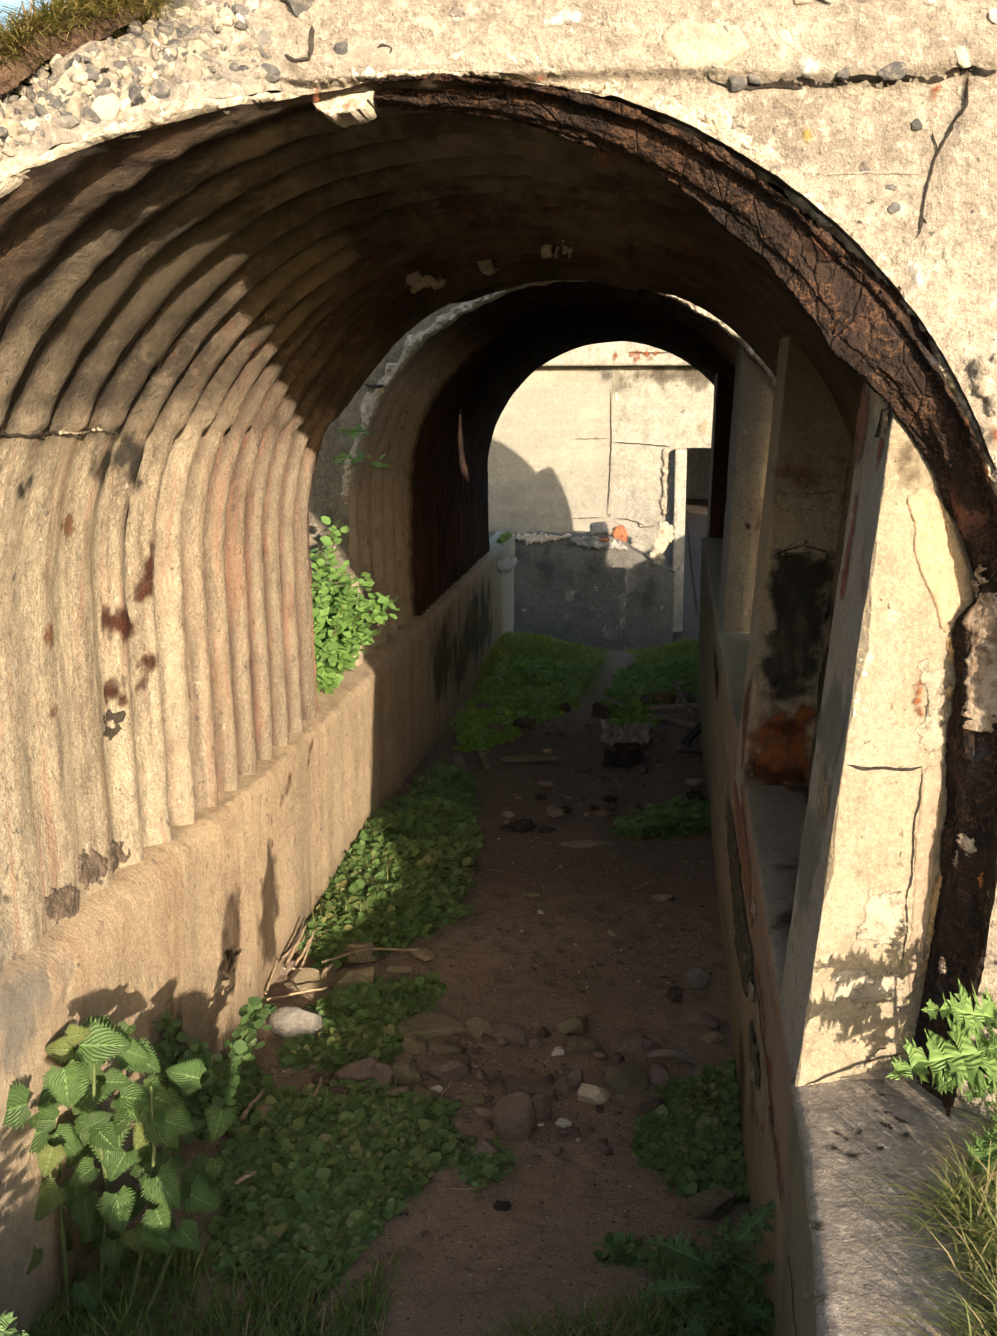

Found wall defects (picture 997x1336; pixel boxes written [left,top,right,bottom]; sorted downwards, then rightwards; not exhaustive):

crack [704,66,996,239]
spalling [0,36,997,497]
crack [0,424,123,438]
corrosion [854,380,868,462]
spalling [496,532,628,574]
spalling [650,447,676,566]
corrosion [951,493,989,537]
spalling [103,709,126,741]
corrosion [741,680,817,786]
peeling [830,487,997,1010]
spalling [43,838,131,924]
crack [750,941,775,1145]